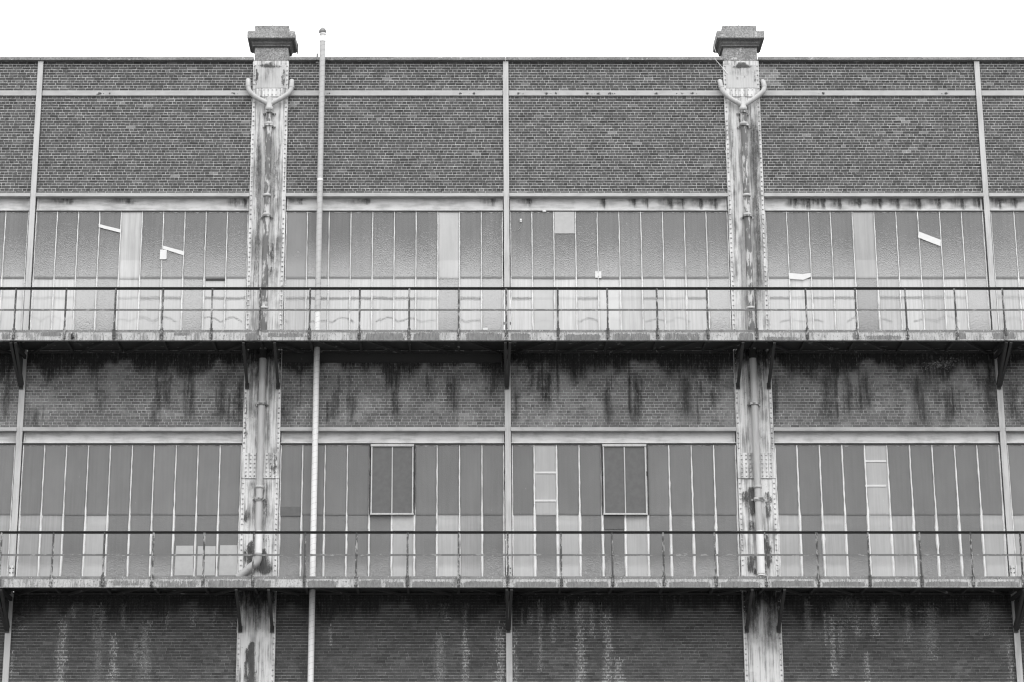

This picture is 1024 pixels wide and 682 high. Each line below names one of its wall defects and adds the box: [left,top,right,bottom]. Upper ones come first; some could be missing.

damp [985,370,995,412]
damp [55,605,75,682]
damp [461,614,470,682]
damp [573,597,626,682]
damp [824,603,881,676]